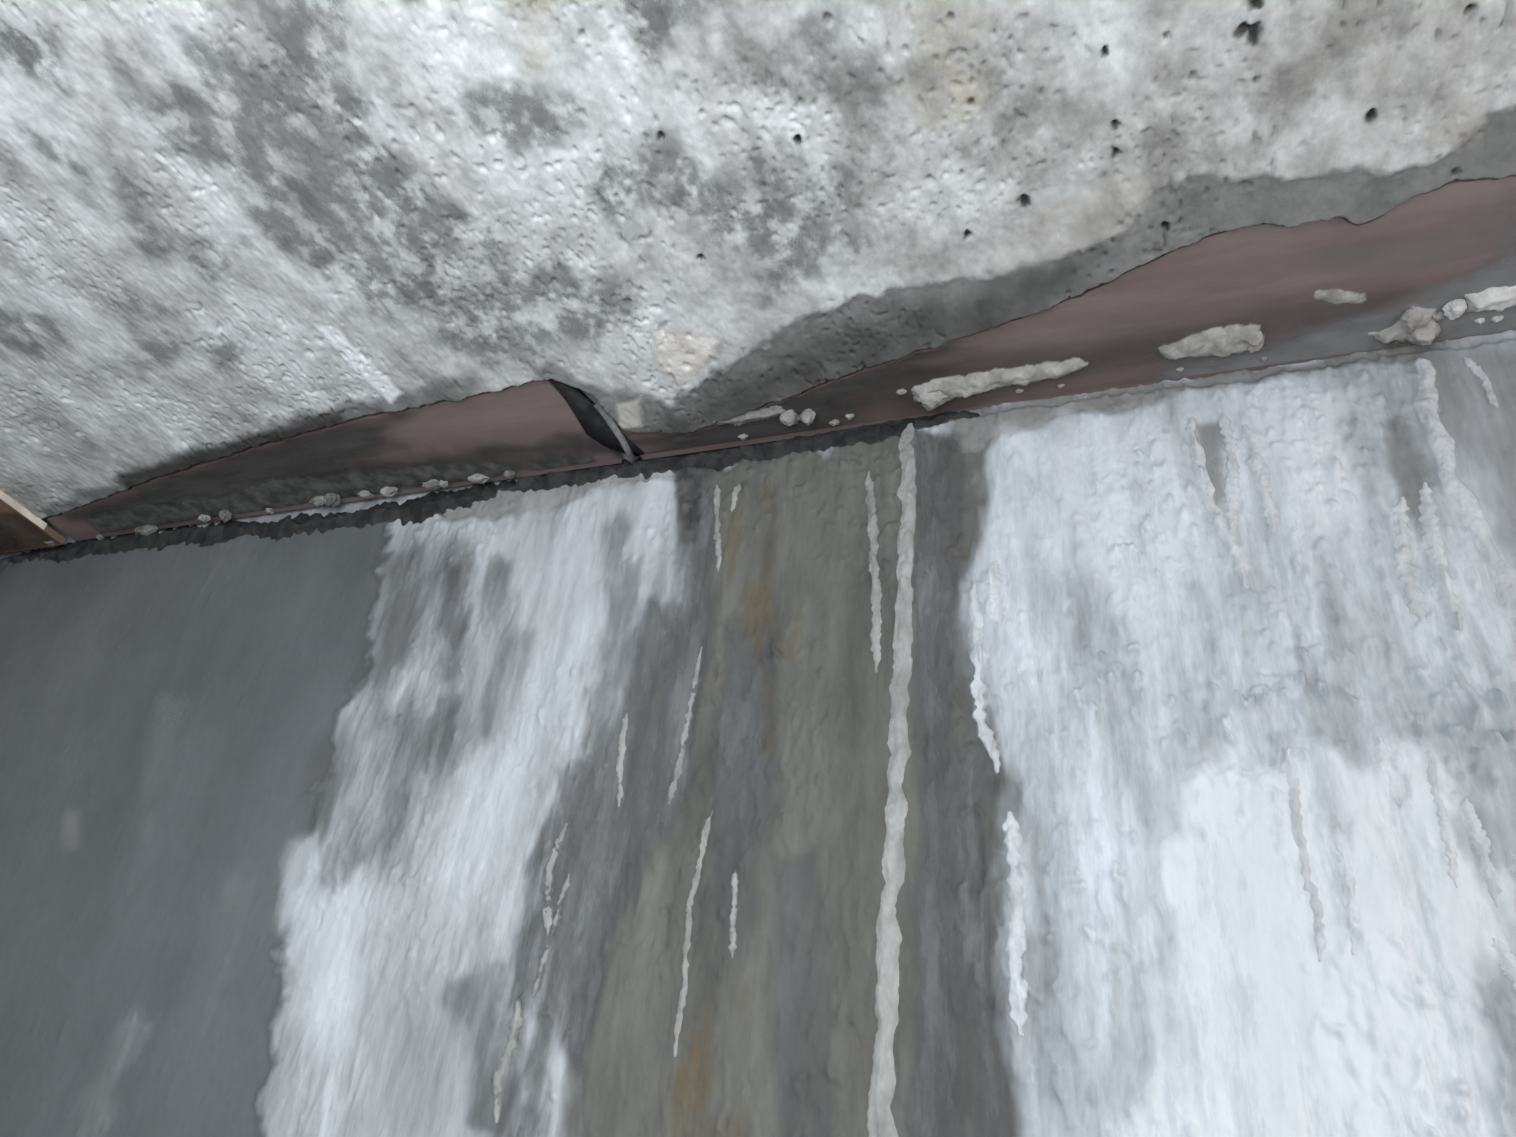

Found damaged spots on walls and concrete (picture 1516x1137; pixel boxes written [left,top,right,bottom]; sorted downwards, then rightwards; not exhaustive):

spalling [1366,108,1377,122]
spalling [618,401,640,428]
spalling [651,329,721,387]
flaking render [951,344,1419,454]
flaking render [440,470,677,521]
flaking render [1200,425,1220,498]
water stain [1184,389,1362,589]
flaking render [1392,424,1424,514]
water stain [1391,358,1516,631]
water stain [474,422,1028,1137]
water stain [1122,737,1516,1137]